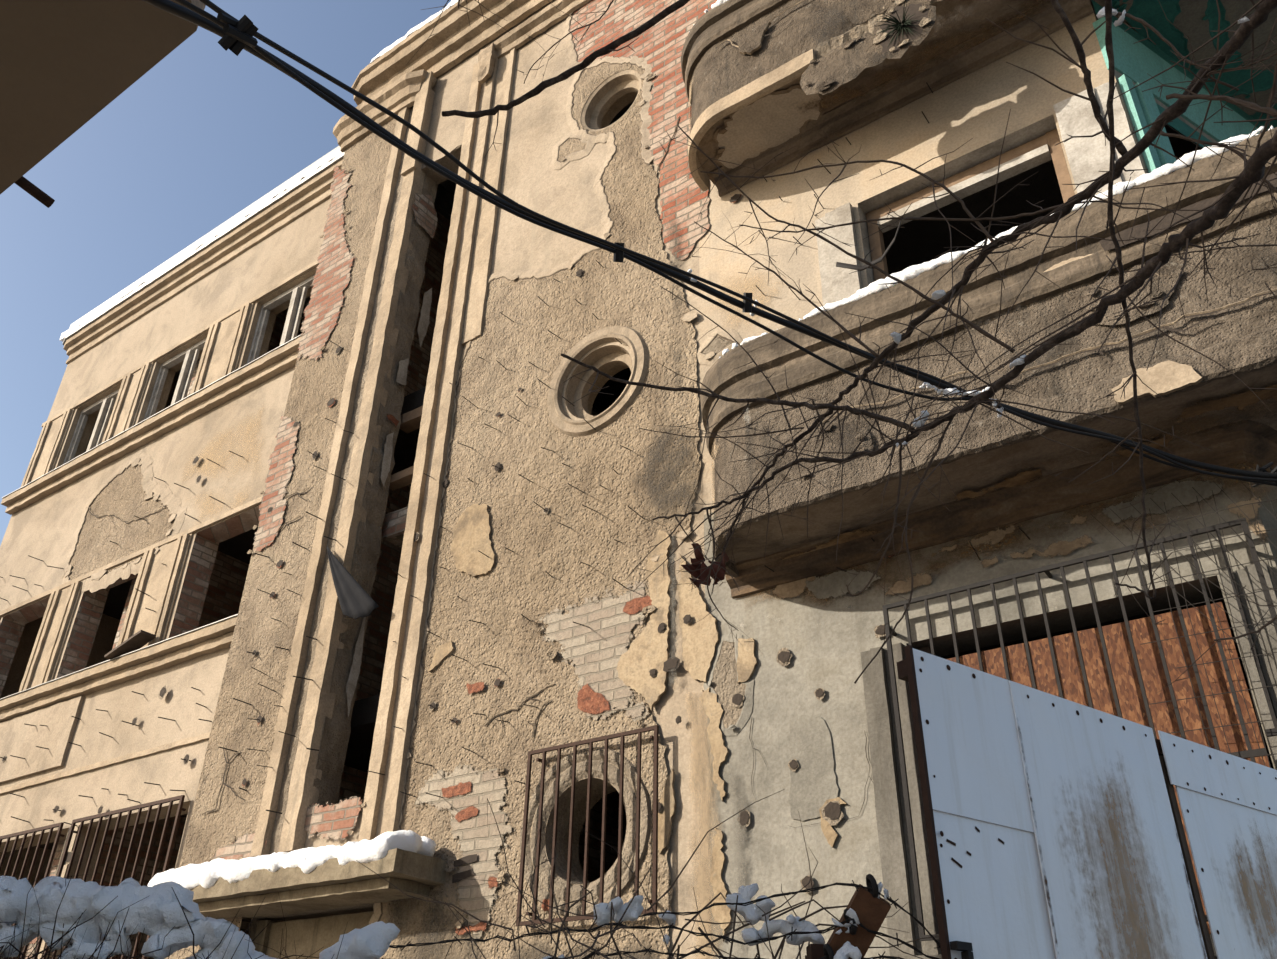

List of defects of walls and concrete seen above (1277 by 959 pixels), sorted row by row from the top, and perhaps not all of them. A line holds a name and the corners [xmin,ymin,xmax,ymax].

peeling [713,0,936,169]
peeling [1169,0,1277,73]
flaking render [297,165,355,361]
flaking render [1111,360,1203,404]
flaking render [61,449,187,593]
flaking render [247,411,300,554]
spalling [369,0,758,959]
peeling [772,569,932,599]
spalling [776,648,792,666]
flaking render [304,796,366,842]
rust [1086,786,1162,959]
rust [1236,845,1277,945]